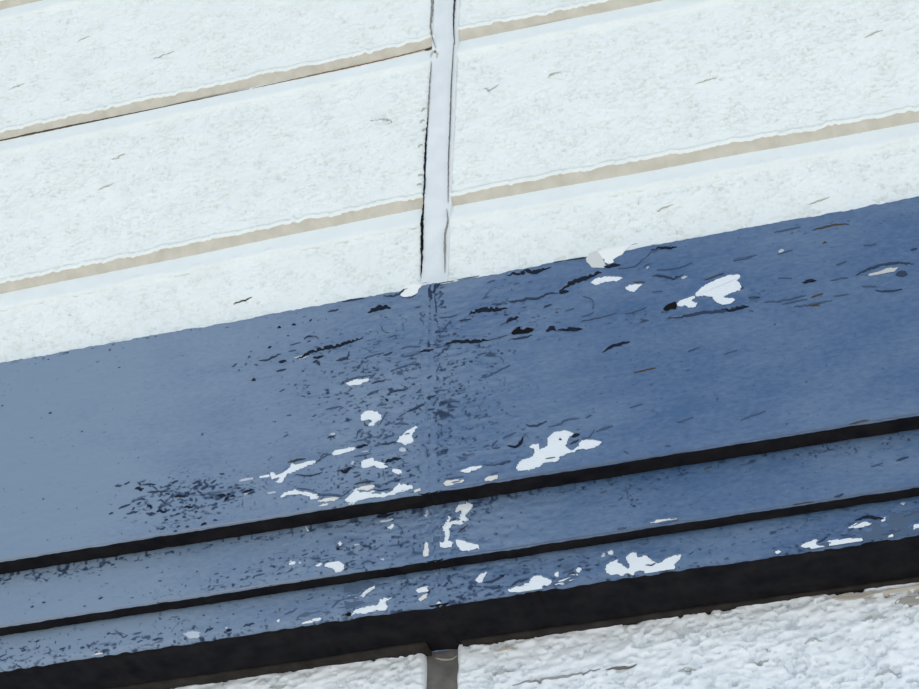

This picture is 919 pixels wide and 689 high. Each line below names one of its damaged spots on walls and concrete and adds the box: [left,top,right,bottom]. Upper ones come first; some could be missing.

crack [232,0,918,497]
peeling [677,274,744,308]
peeling [361,411,381,426]
peeling [397,426,418,452]
peeling [516,430,602,471]
peeling [109,447,421,532]
crack [377,512,428,533]
peeling [440,501,481,551]
peeling [801,517,886,549]
peeling [601,550,681,576]
peeling [349,586,392,616]